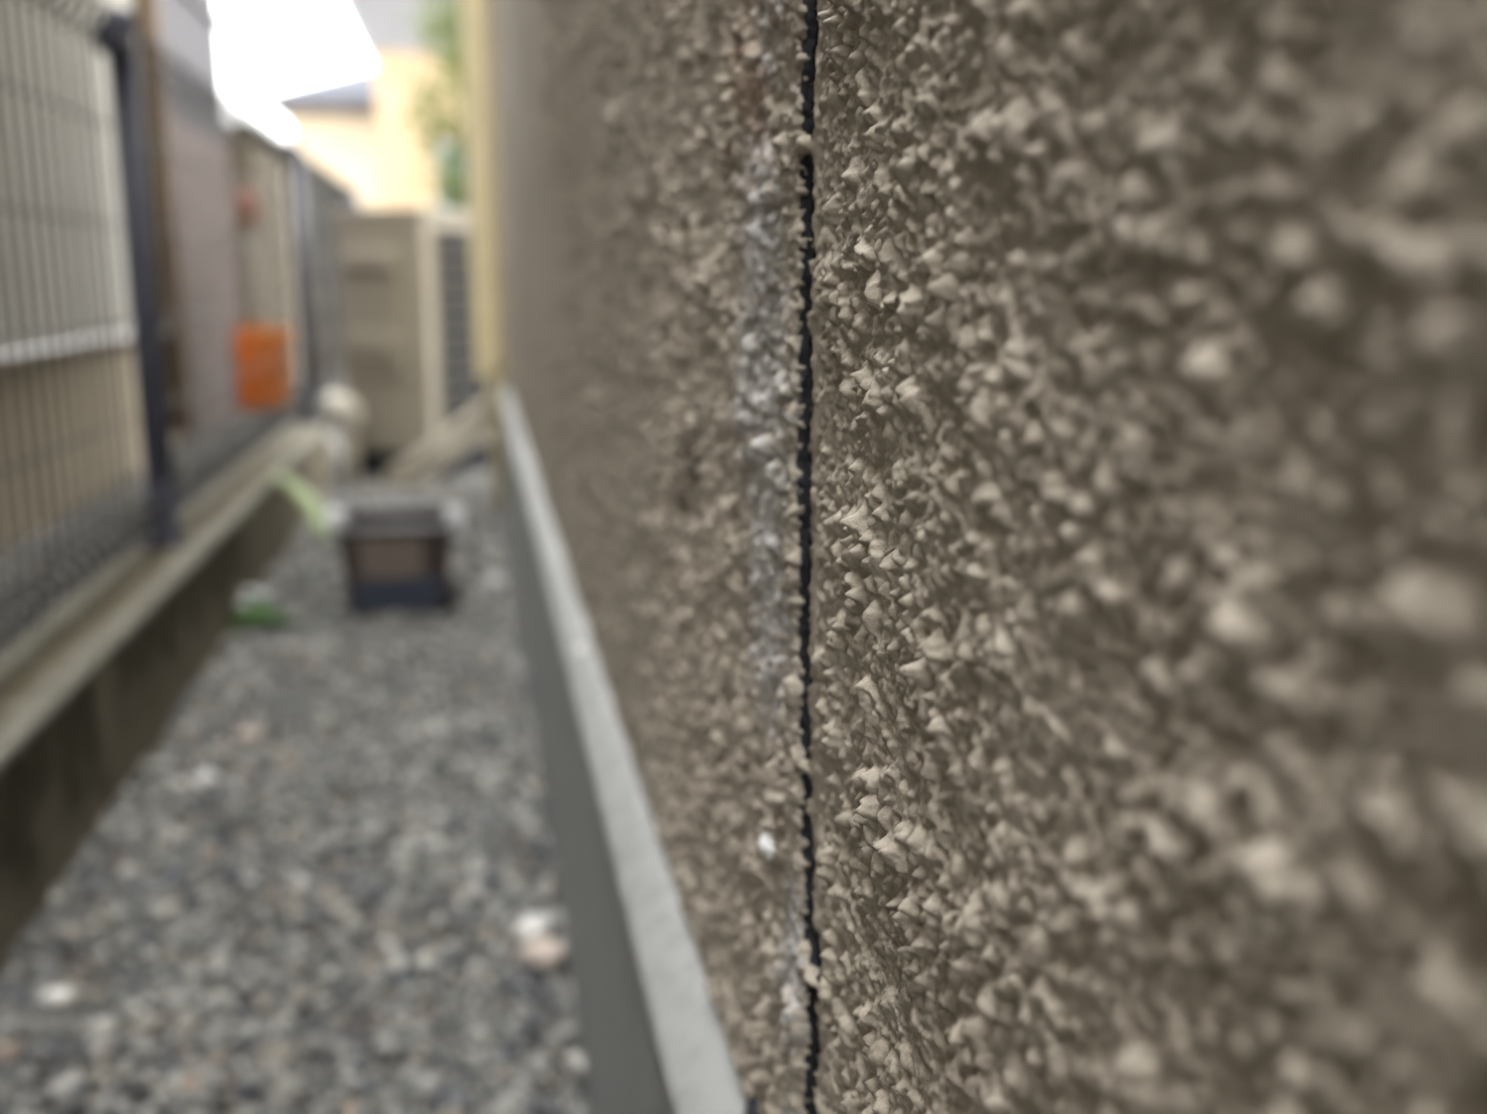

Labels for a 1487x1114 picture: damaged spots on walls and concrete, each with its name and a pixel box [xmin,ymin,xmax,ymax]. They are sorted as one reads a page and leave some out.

crack [784,0,822,1114]